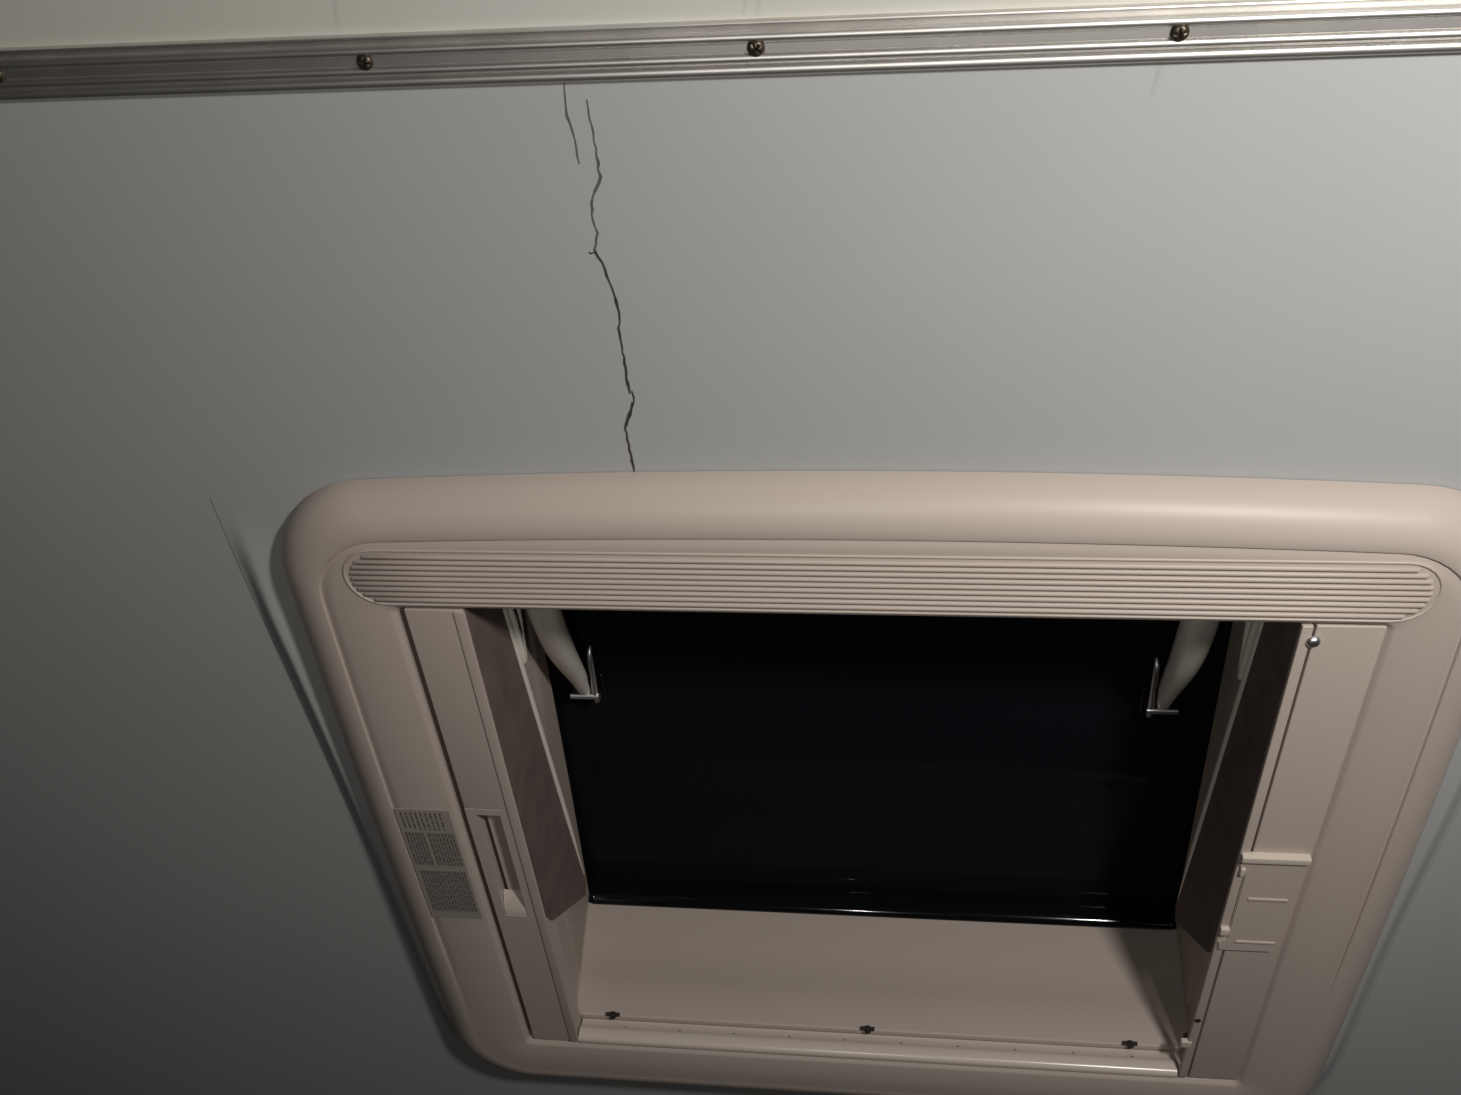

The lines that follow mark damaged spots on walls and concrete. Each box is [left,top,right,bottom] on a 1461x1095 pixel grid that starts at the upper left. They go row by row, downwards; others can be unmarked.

crack [564,82,635,472]